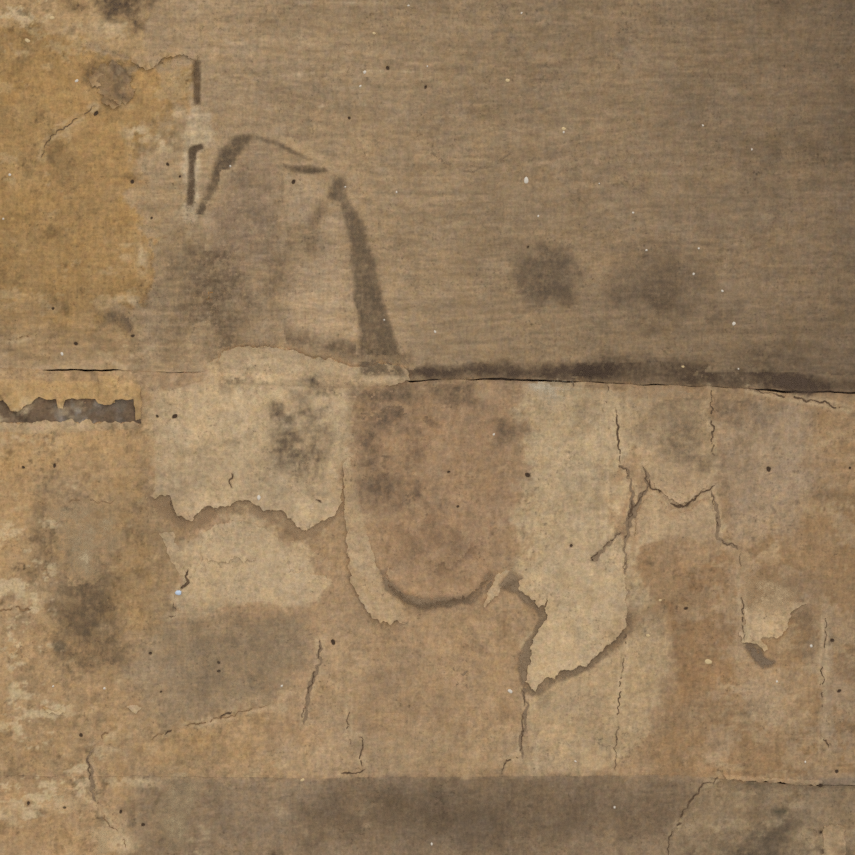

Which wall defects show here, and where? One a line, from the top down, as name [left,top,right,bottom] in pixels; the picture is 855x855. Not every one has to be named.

crack [41,107,92,157]
leakage [187,144,205,214]
leakage [209,136,249,190]
leakage [330,181,644,390]
peeling [0,375,142,436]
leakage [727,370,835,396]
peeling [145,346,410,625]
crack [591,386,741,575]
peeling [483,533,631,696]
peeling [739,581,808,669]
crack [301,639,323,723]
crack [667,777,718,855]